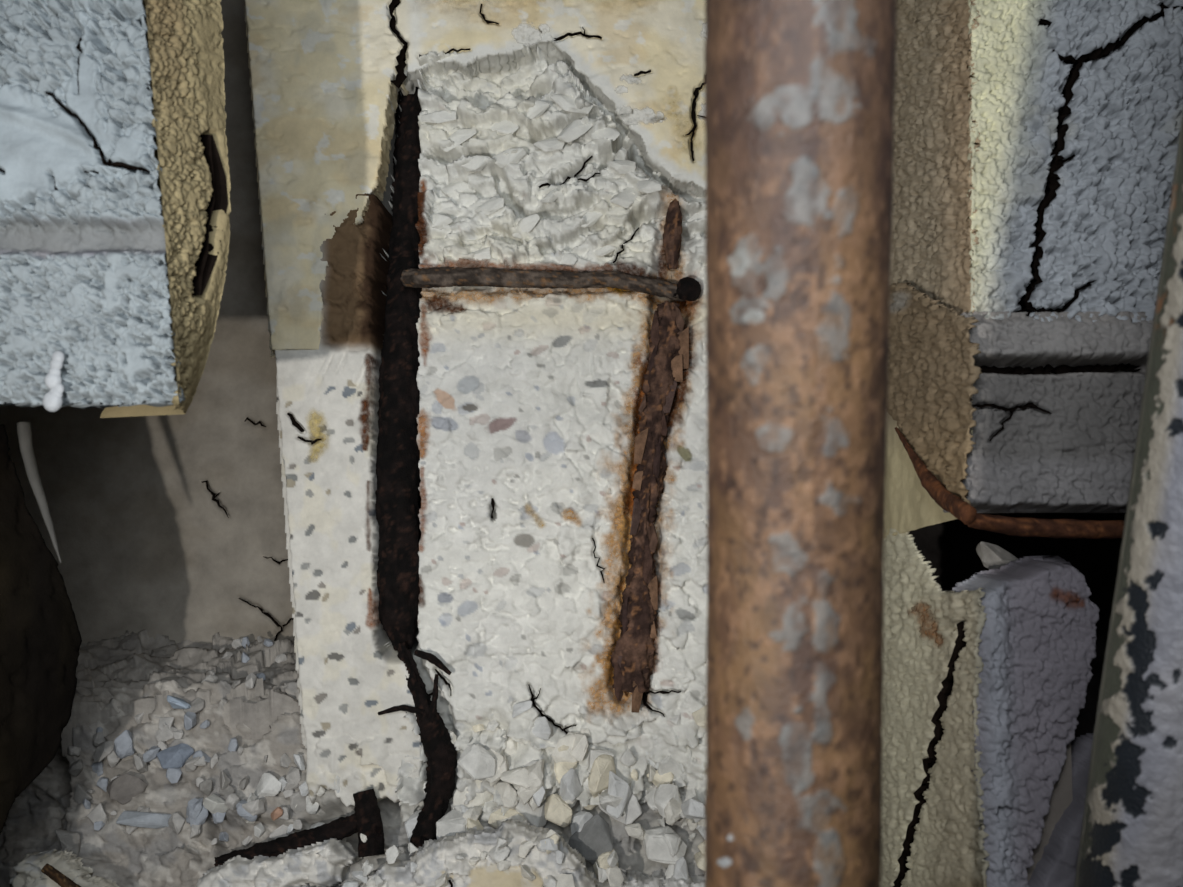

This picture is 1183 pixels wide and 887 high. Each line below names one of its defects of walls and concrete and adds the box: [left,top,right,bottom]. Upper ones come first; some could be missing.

crack [389,0,470,89]
crack [479,4,499,25]
crack [554,27,602,41]
crack [685,82,705,161]
crack [999,2,1183,321]
rust [415,181,692,281]
rust [359,354,378,450]
rust [418,415,428,550]
spalling [275,24,708,842]
rust [421,287,697,713]
rust [367,589,381,626]
crack [893,621,966,887]